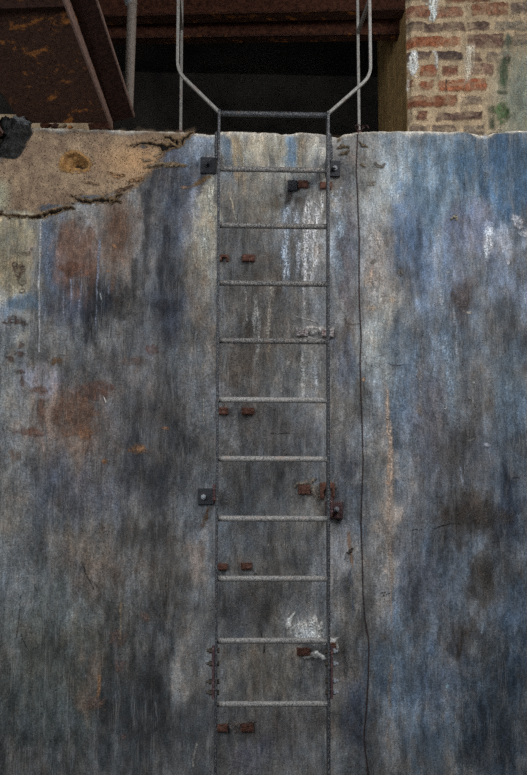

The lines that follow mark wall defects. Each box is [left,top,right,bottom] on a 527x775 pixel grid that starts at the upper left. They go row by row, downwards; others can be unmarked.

leakage [426,0,438,21]
leakage [407,51,419,91]
leakage [464,45,475,81]
peeling [0,130,188,213]
leakage [95,188,152,323]
leakage [193,185,216,267]
leakage [483,223,495,258]